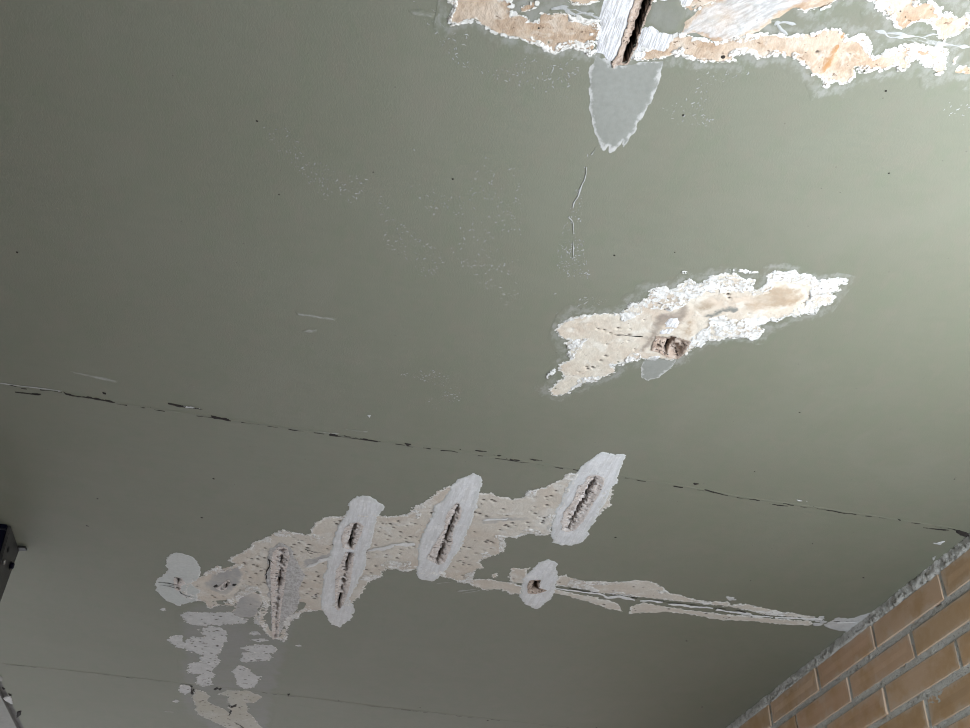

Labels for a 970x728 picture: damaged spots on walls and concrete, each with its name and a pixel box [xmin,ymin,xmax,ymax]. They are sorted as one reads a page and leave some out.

flaking render [433,0,605,64]
flaking render [620,0,970,102]
flaking render [533,261,859,402]
crack [0,383,580,471]
flaking render [596,489,614,516]
crack [618,475,969,561]
flaking render [167,473,578,728]